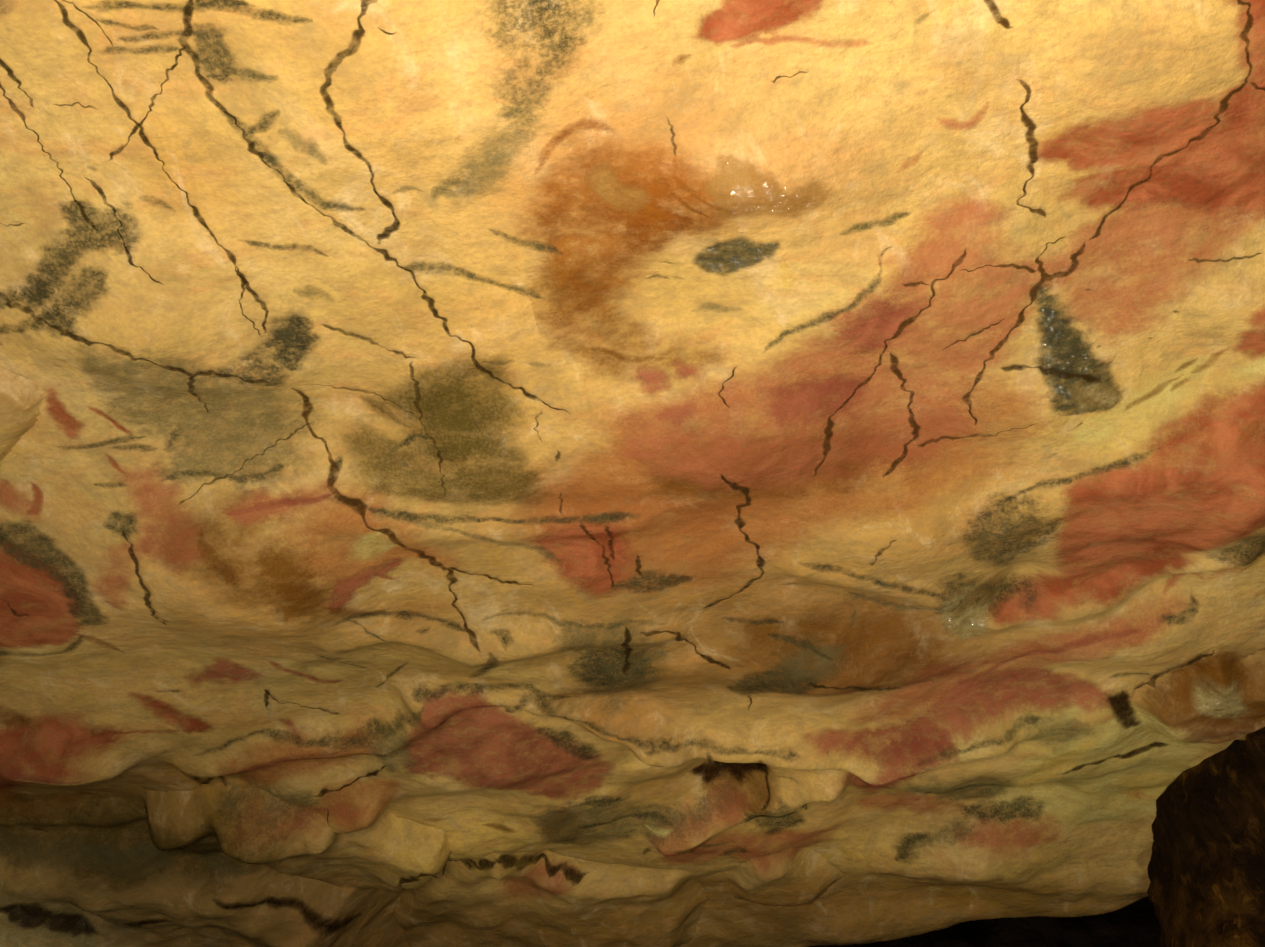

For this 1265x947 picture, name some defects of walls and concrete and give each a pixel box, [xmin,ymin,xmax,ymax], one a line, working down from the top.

crack [0,0,569,459]
crack [814,0,1265,476]
damp [48,0,1265,641]
crack [0,293,532,649]
crack [559,499,641,586]
crack [705,475,764,608]
damp [139,691,210,732]
damp [190,659,609,798]
crack [621,628,730,672]
damp [586,722,796,764]
damp [662,792,826,865]
damp [216,898,359,933]